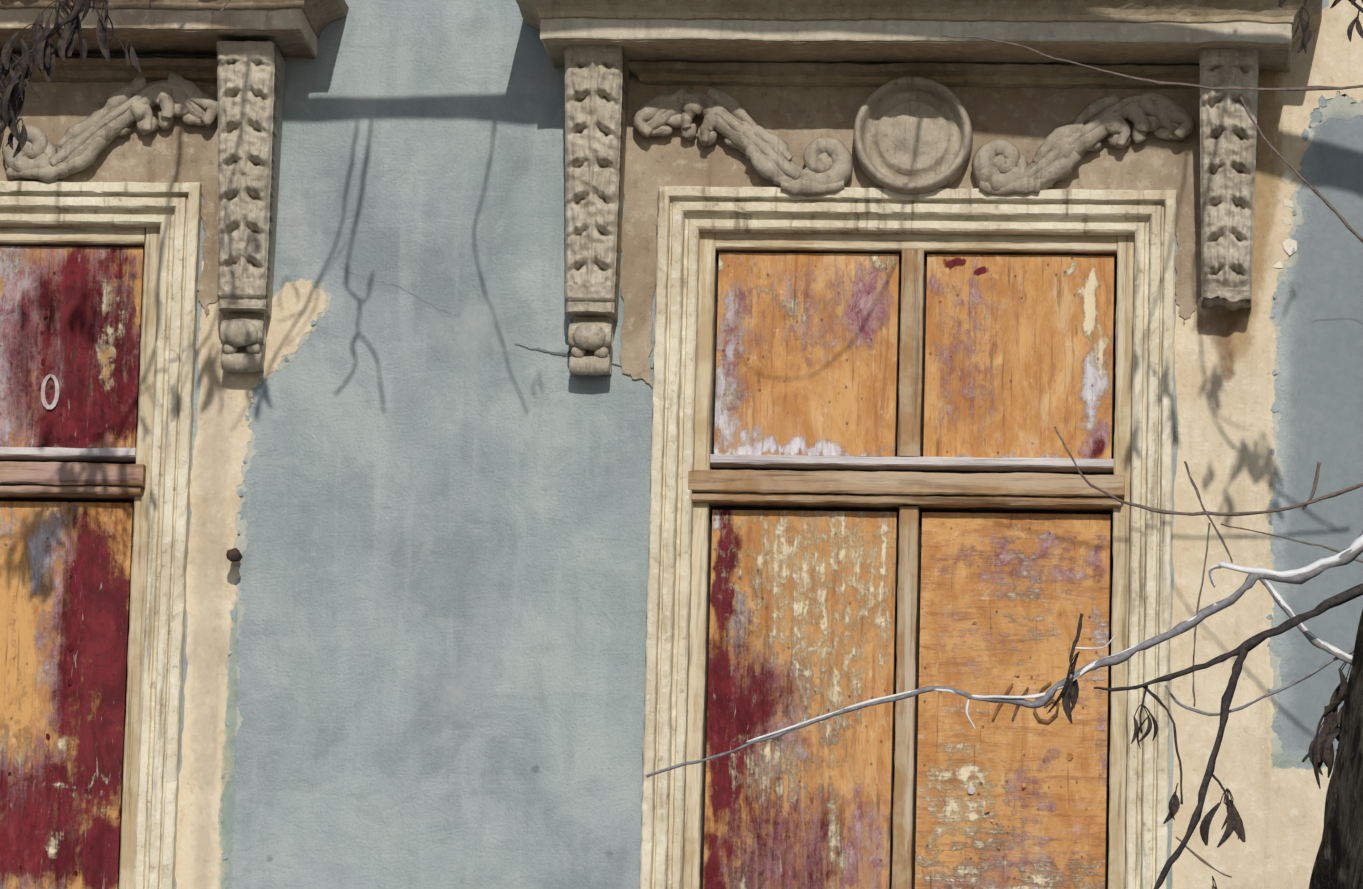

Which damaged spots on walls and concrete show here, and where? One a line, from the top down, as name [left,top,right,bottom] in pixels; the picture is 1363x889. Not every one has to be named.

peeling [175,278,332,889]
peeling [1170,0,1363,889]